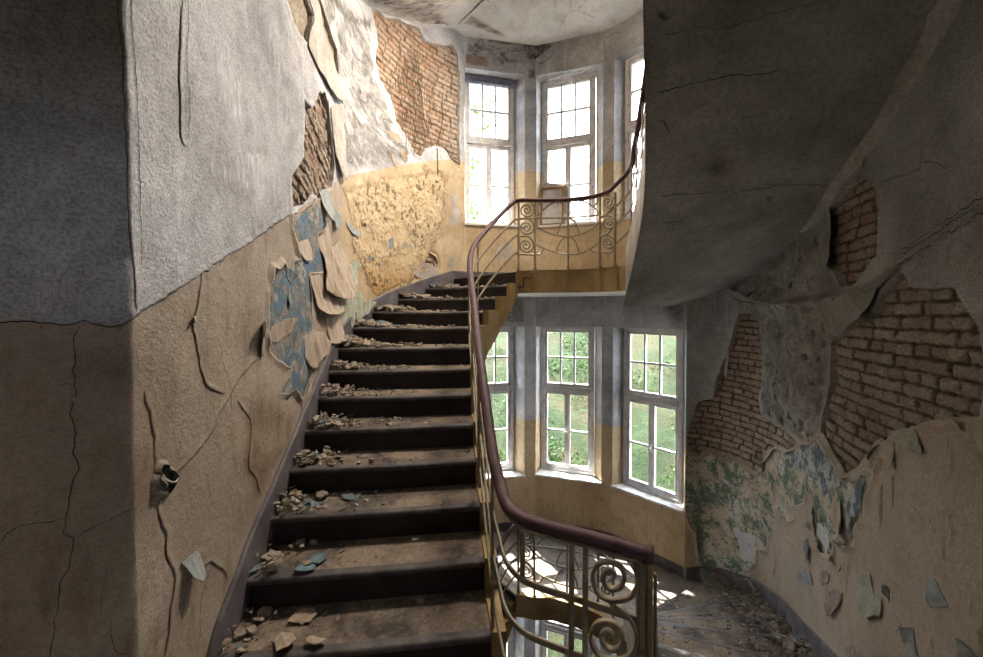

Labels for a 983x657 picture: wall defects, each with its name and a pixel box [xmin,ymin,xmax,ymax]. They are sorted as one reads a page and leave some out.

water stain [327,0,405,164]
crack [658,70,782,93]
flaking render [386,129,408,167]
flaking render [413,249,457,279]
flaking render [819,208,831,270]
peeling [261,189,377,412]
peeling [685,428,922,616]
peeling [854,573,890,635]